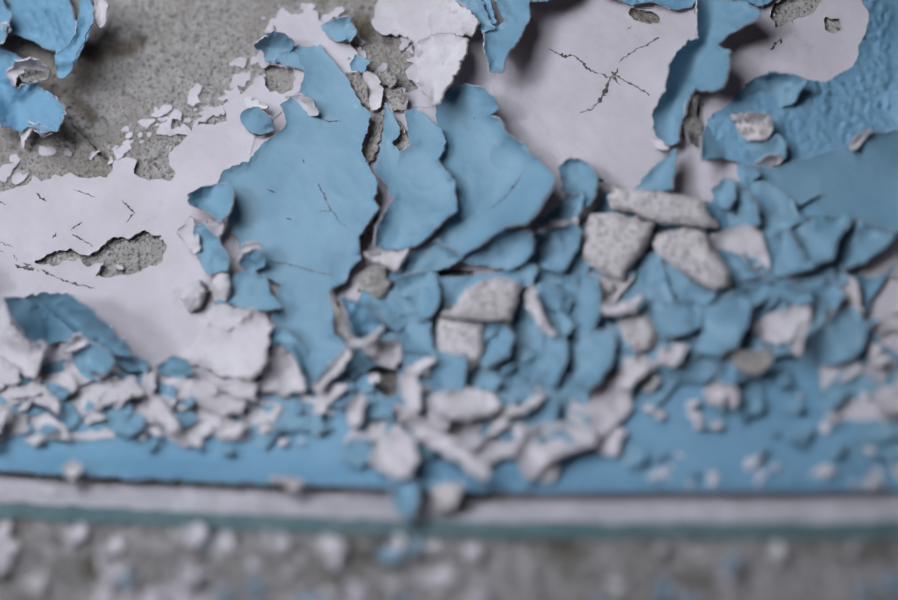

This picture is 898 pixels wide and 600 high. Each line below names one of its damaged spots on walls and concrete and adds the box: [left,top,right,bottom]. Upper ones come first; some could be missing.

crack [549,26,659,113]
flaking render [0,0,868,489]
peeling [730,112,898,480]
peeling [270,475,305,492]
peeling [340,351,522,521]